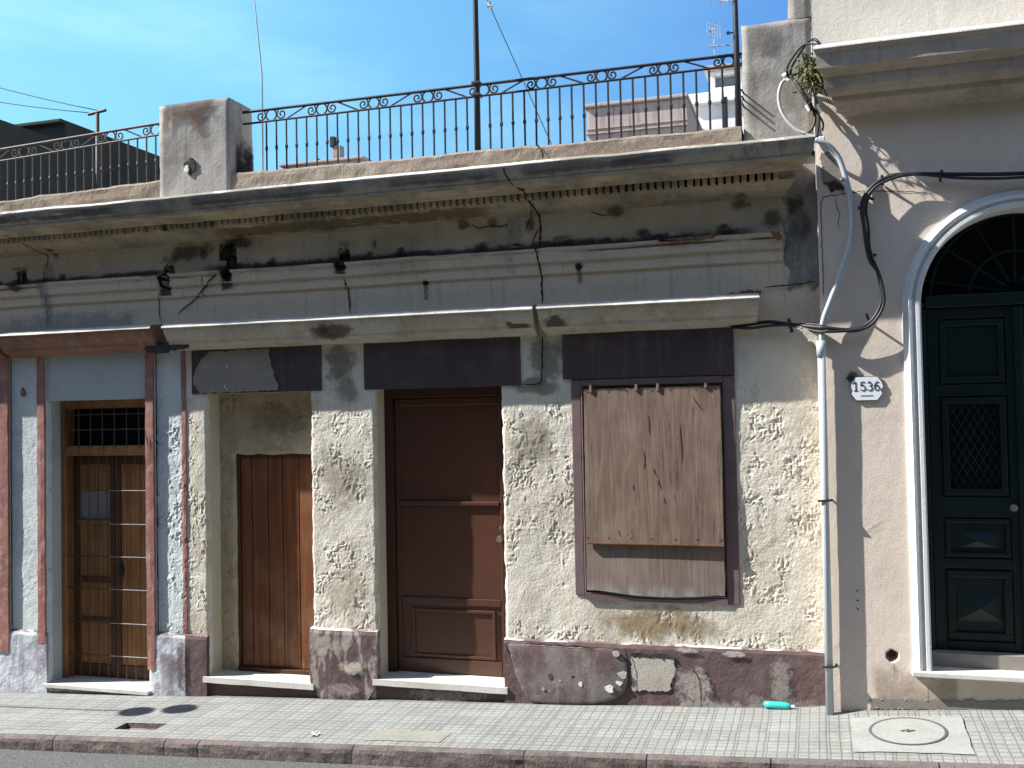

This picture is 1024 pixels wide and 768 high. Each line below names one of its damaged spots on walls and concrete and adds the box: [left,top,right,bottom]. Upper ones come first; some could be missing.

water stain [211,200,740,271]
crack [471,164,543,302]
hole [157,264,175,296]
crack [157,272,216,323]
hole [217,249,237,290]
peeling [193,348,278,394]
crack [523,336,543,386]
peeling [160,642,185,691]
peeling [328,662,362,695]
peeling [605,647,809,708]